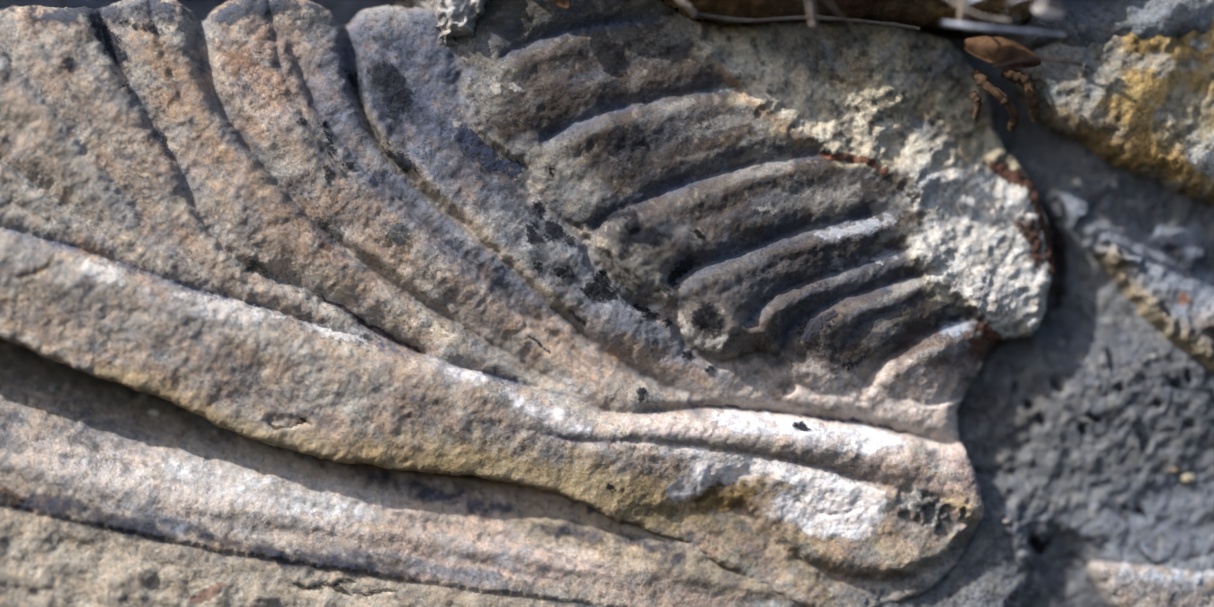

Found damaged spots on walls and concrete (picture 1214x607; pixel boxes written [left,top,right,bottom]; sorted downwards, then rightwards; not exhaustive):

corrosion [983,161,1069,310]